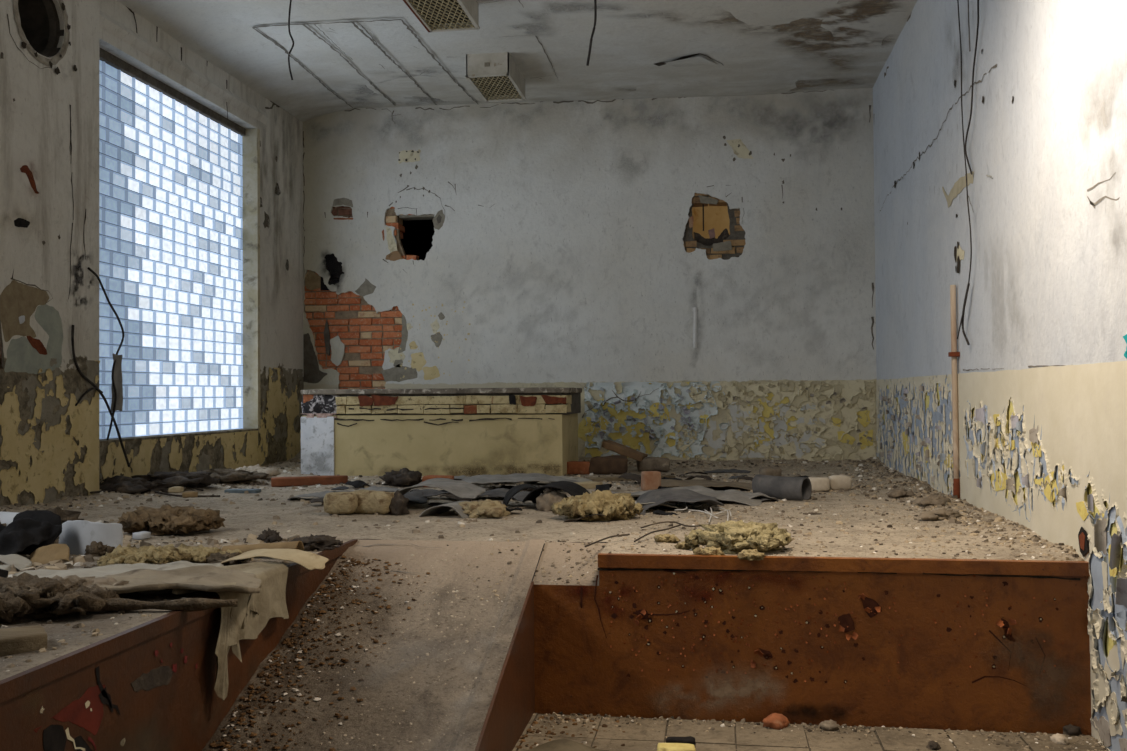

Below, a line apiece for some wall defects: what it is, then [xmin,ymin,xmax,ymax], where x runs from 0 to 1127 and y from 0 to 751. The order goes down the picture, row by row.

leakage [755,0,892,90]
crack [879,64,997,212]
spalling [382,149,445,261]
spalling [683,193,746,260]
peeling [0,253,471,506]
flaking render [509,395,566,406]
peeling [578,361,1127,751]